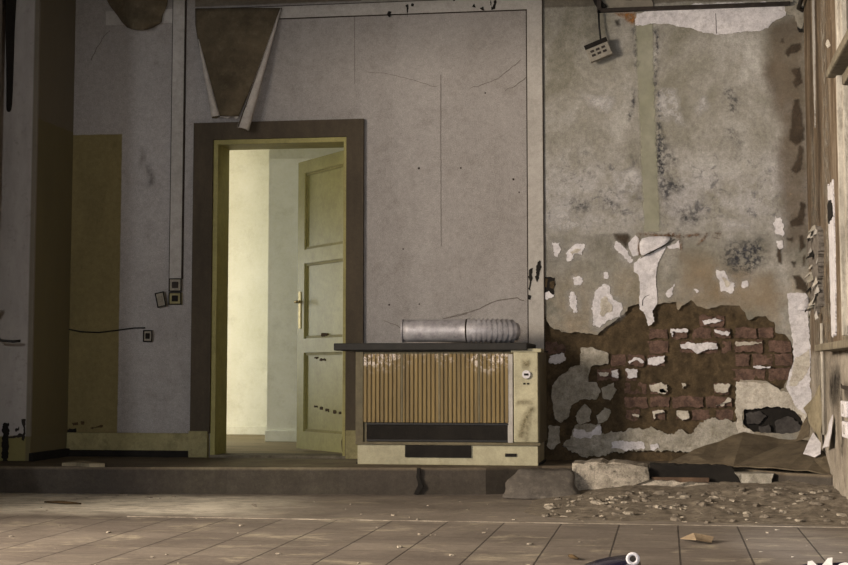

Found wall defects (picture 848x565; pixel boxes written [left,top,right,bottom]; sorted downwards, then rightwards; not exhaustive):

spalling [545,235,803,461]
spalling [1,419,26,461]
crack [414,468,424,495]